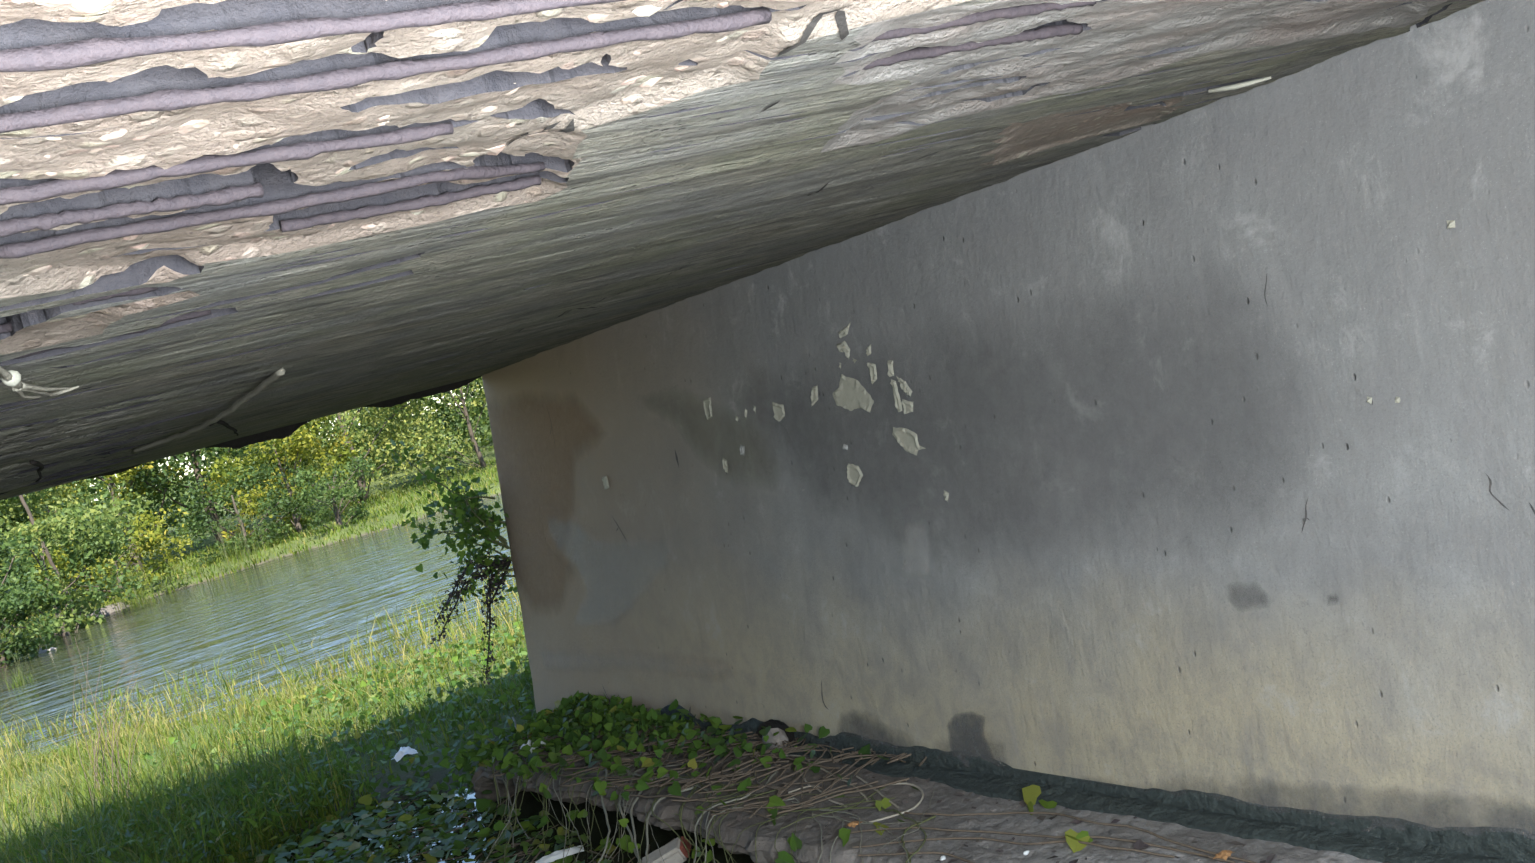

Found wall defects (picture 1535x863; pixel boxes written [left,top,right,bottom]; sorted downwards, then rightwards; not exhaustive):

spalling [0,0,1465,495]